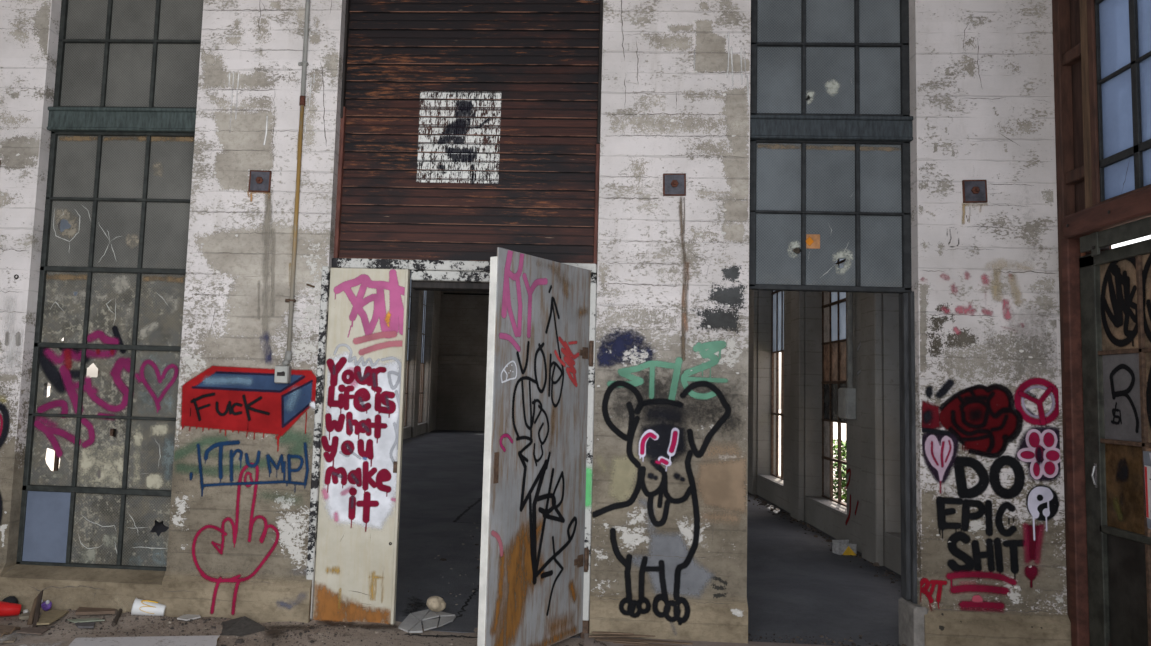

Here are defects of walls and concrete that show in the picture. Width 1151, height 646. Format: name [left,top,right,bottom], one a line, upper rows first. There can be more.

peeling [200,1,338,193]
corrosion [663,173,689,361]
corrosion [962,180,988,224]
peeling [166,193,329,590]